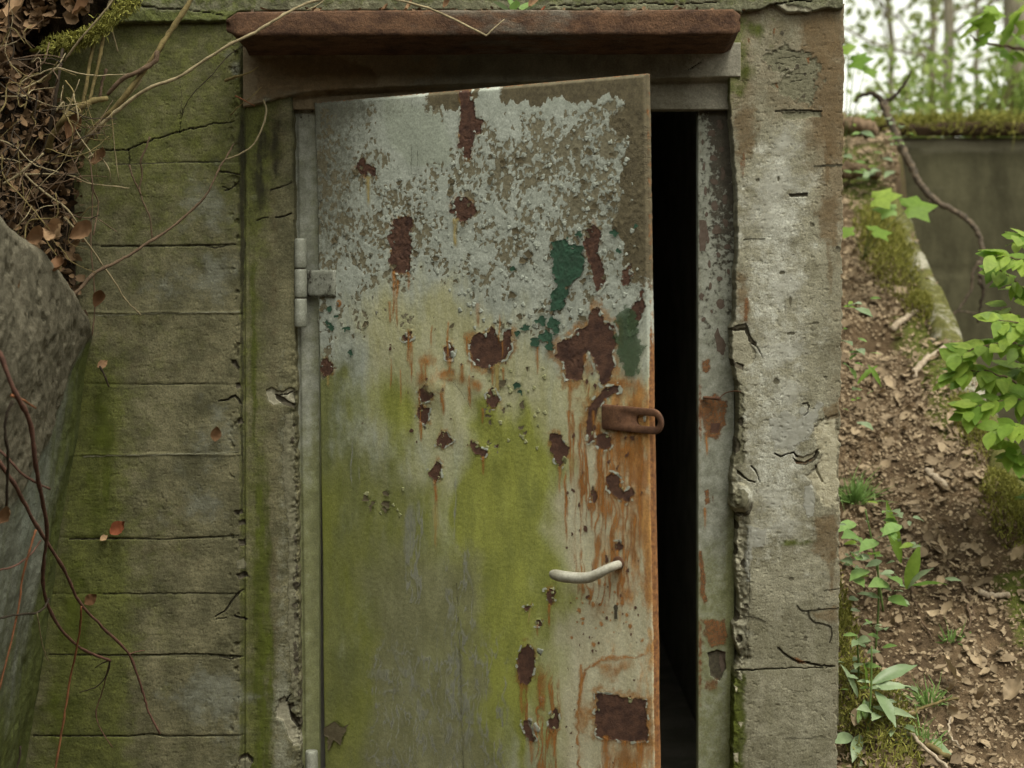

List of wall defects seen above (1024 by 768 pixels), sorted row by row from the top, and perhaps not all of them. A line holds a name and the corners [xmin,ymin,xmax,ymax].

crack [105,86,240,191]
water stain [238,120,279,313]
peeling [317,129,647,383]
peeling [699,120,731,322]
crack [103,589,247,620]
spalling [266,388,303,746]
peeling [484,367,546,450]
rust [515,225,652,768]
spalling [730,515,749,692]
crack [735,551,822,693]
crack [797,589,839,643]